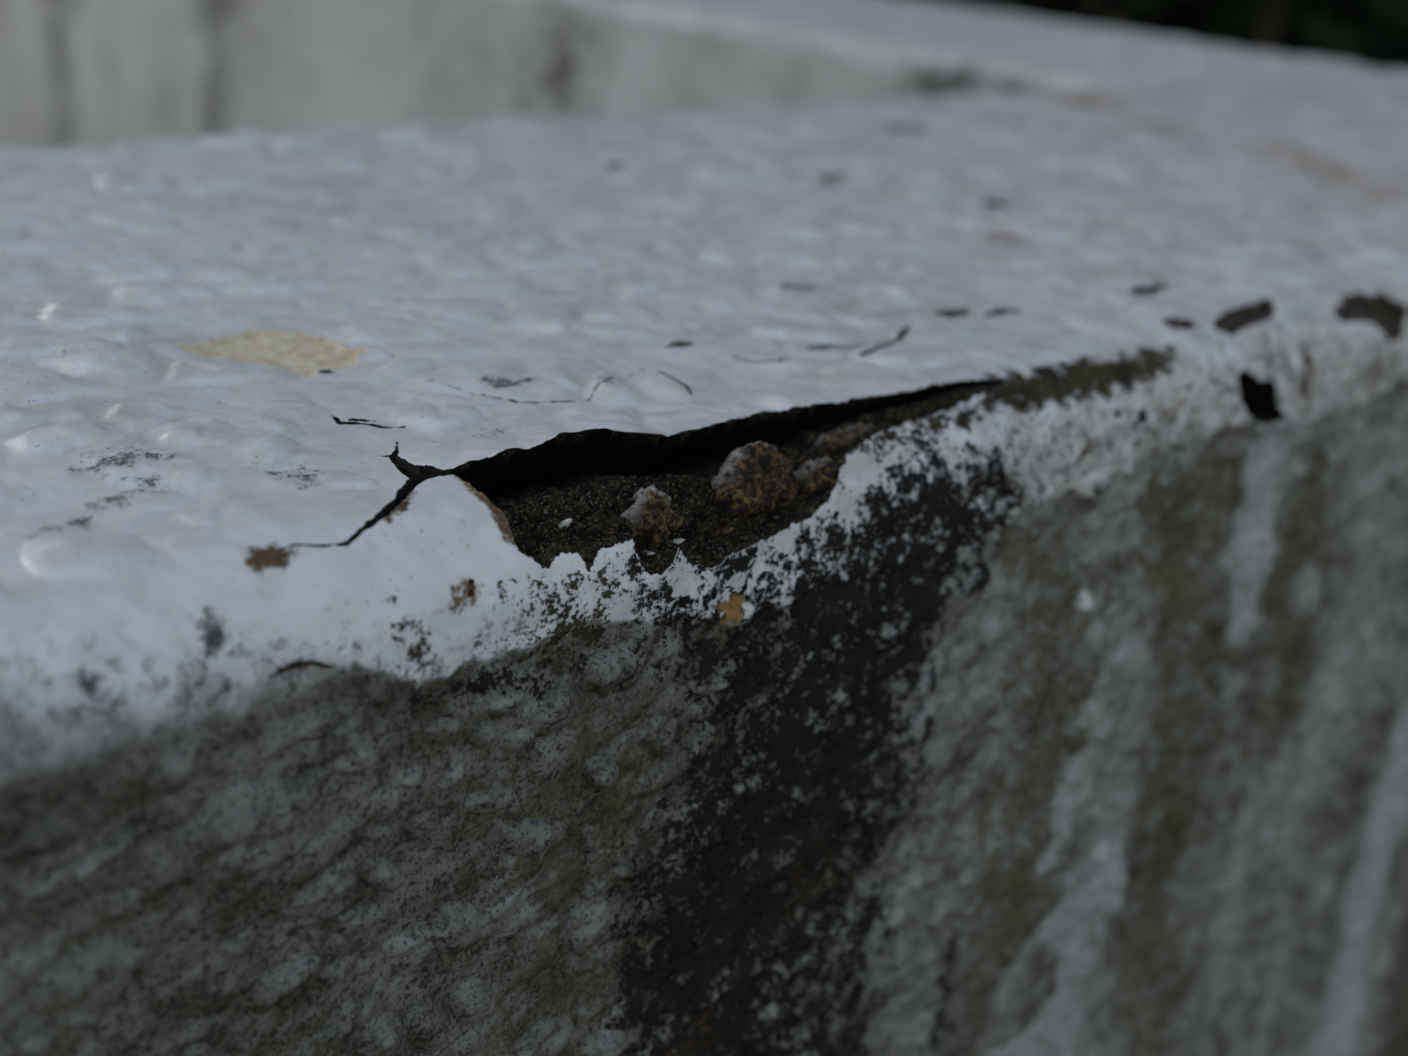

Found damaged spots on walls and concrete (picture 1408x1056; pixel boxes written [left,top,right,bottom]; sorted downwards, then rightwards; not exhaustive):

spalling [1161,299,1275,336]
spalling [1333,292,1408,343]
crack [277,415,452,551]
spalling [444,377,1012,576]
leakage [373,431,1029,1056]